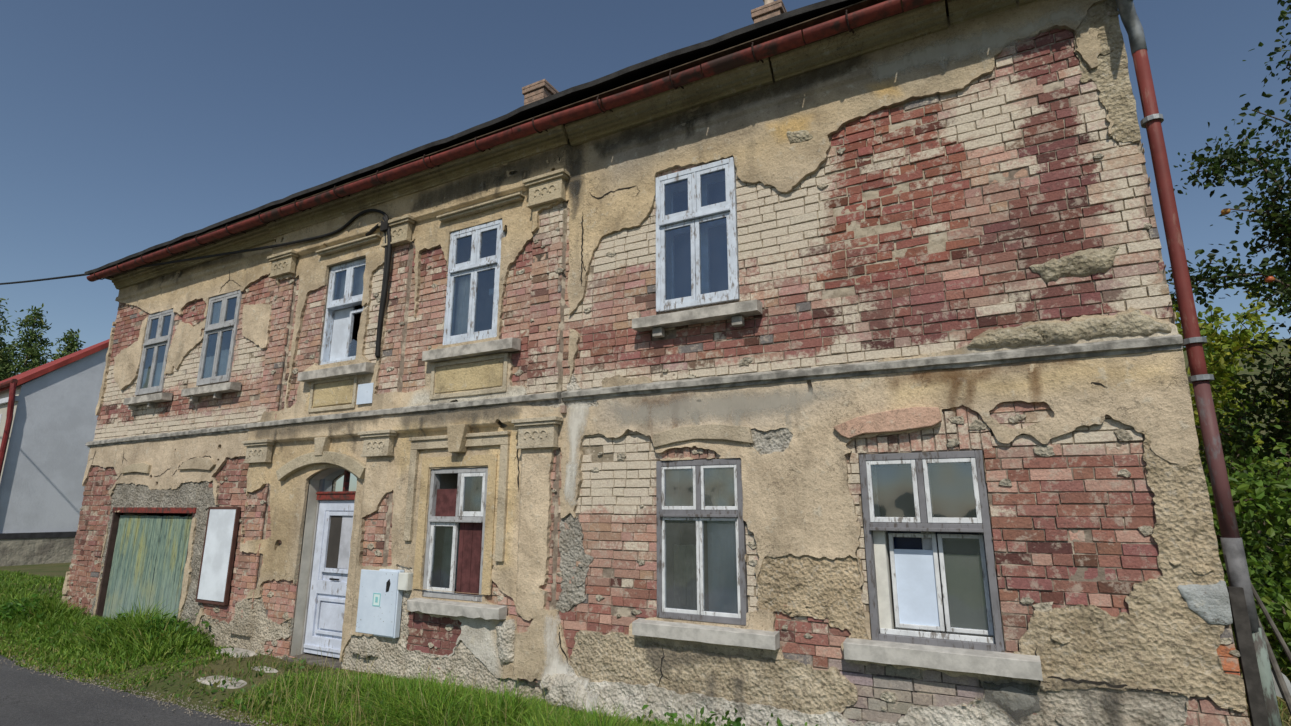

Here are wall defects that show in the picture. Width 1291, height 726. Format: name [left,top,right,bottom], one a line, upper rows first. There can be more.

flaking render [500,0,1175,413]
flaking render [93,274,329,441]
flaking render [363,242,448,394]
flaking render [64,456,300,659]
flaking render [362,492,413,573]
flaking render [341,590,548,704]
flaking render [487,565,533,633]
flaking render [541,401,1251,726]